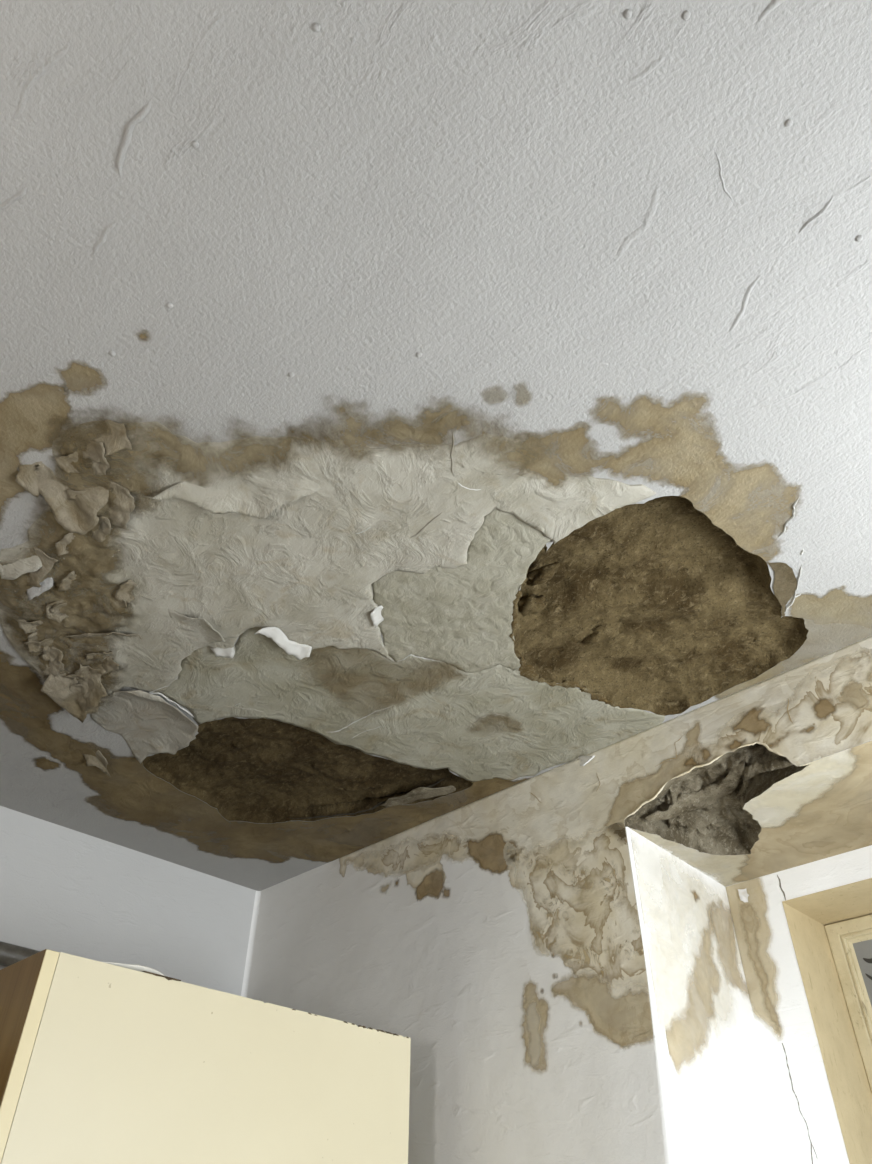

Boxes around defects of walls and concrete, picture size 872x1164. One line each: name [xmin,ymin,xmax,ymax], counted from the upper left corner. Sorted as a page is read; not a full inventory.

peeling [0,419,809,824]
spalling [624,741,808,855]